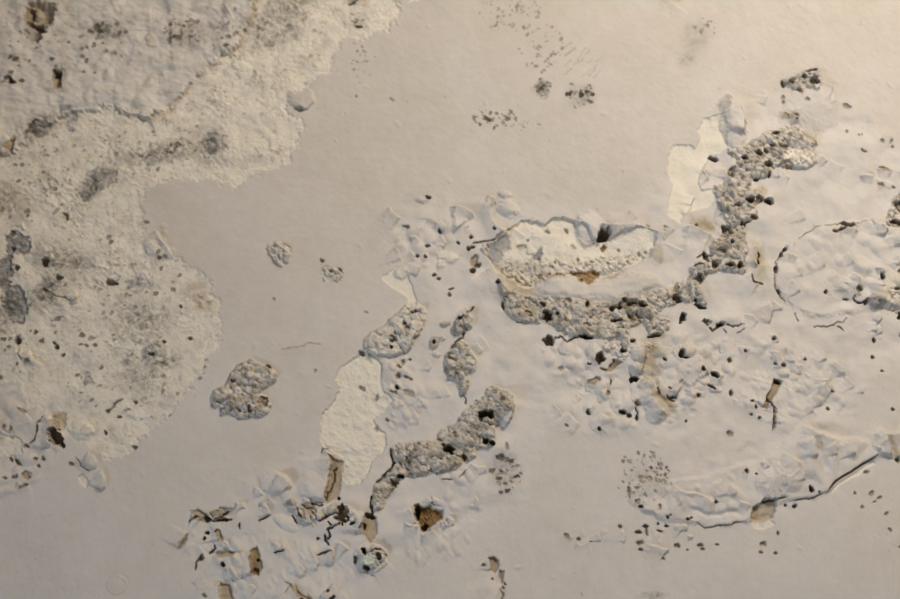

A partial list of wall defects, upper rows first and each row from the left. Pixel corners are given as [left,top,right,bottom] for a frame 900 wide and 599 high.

water stain [478,0,603,109]
spalling [783,68,822,93]
water stain [472,109,541,132]
flaking render [0,0,401,461]
spalling [883,194,900,233]
spalling [879,272,900,320]
spalling [172,111,828,599]